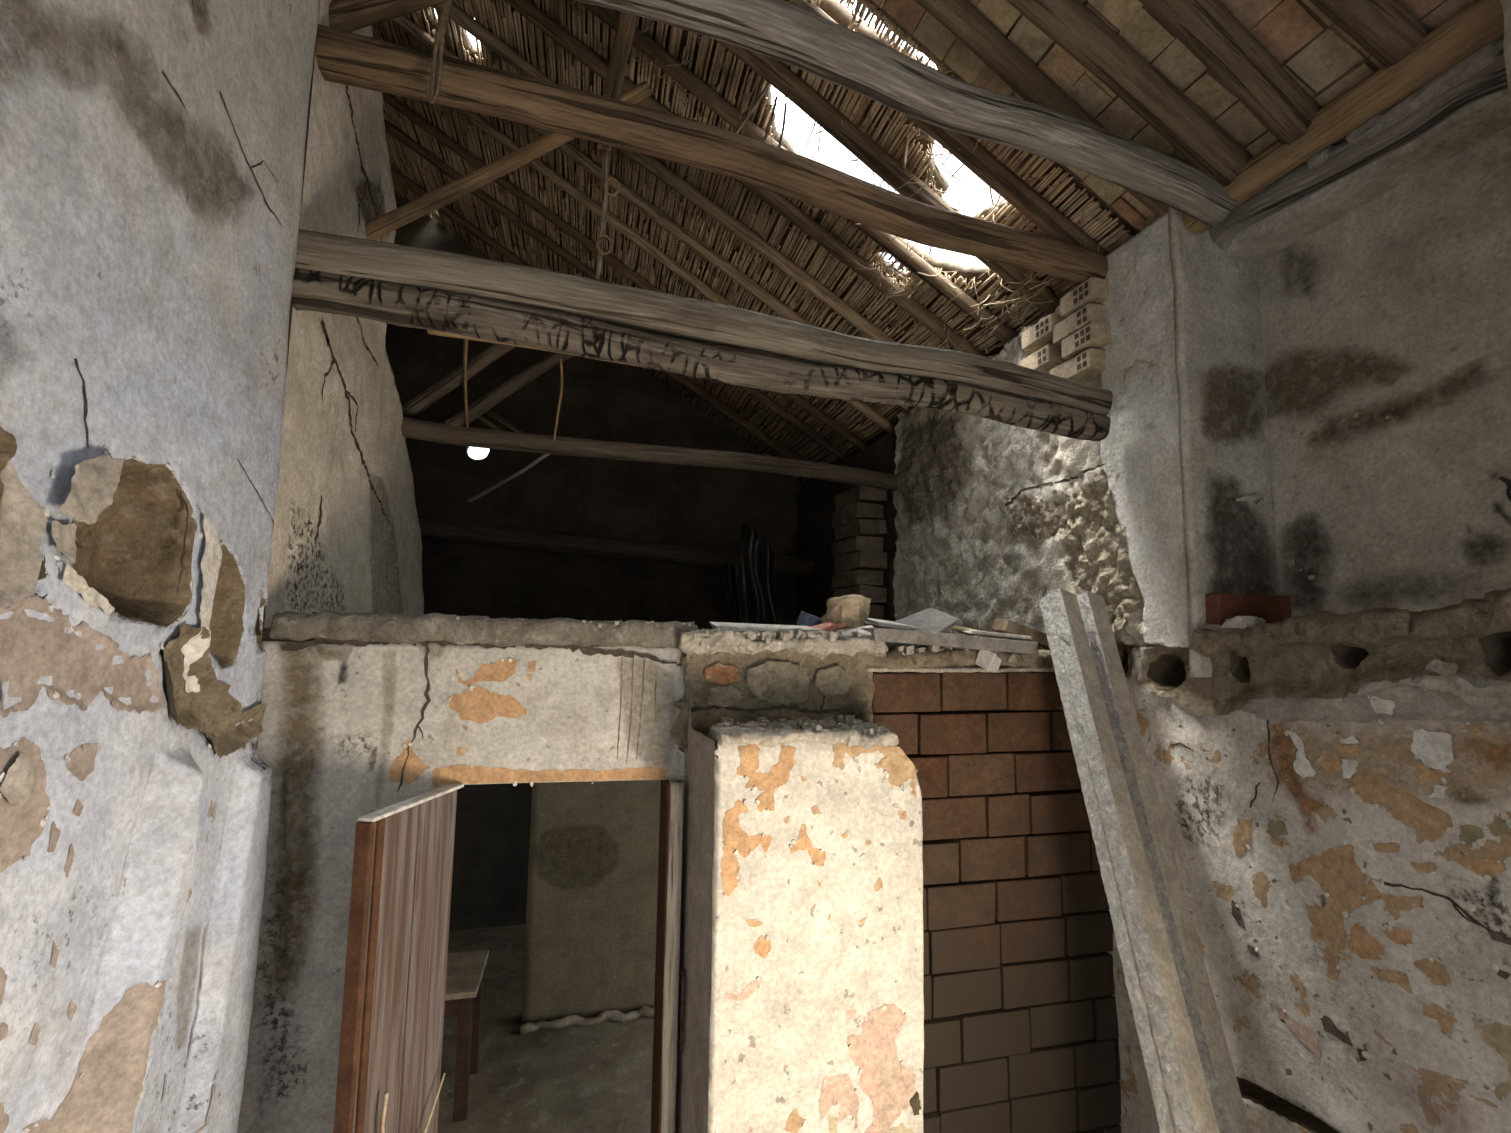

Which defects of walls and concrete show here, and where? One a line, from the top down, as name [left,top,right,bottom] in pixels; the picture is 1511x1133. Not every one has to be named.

water stain [0,0,251,213]
crack [220,91,283,227]
crack [321,317,390,523]
water stain [1202,351,1480,441]
spalling [0,426,267,758]
water stain [1207,478,1275,595]
crack [281,612,681,792]
peeling [388,658,670,787]
water stain [244,646,347,1101]
spalling [1137,636,1511,1100]
crack [1384,882,1491,933]
peeling [0,980,166,1133]